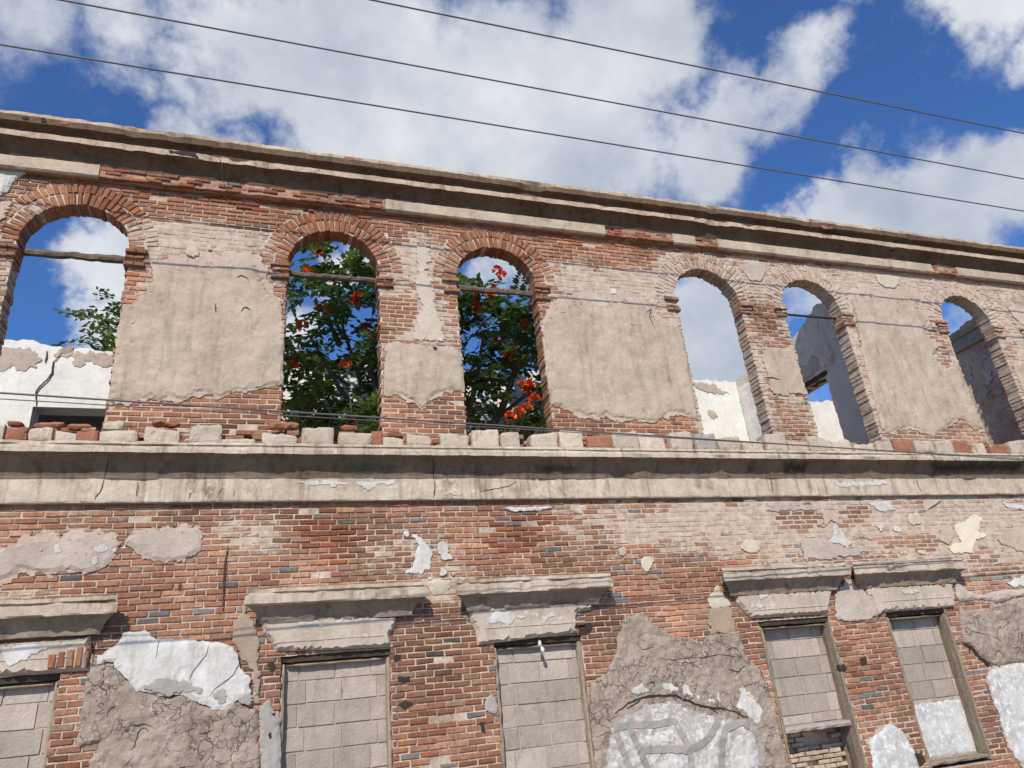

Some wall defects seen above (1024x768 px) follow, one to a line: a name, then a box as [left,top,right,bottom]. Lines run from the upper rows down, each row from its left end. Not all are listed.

crack [35,345,73,406]
flaking render [0,523,205,586]
peeling [403,531,455,580]
spalling [766,501,1024,588]
spalling [963,600,990,610]
flaking render [2,630,286,768]
crack [615,694,748,719]
spalling [833,623,1024,768]